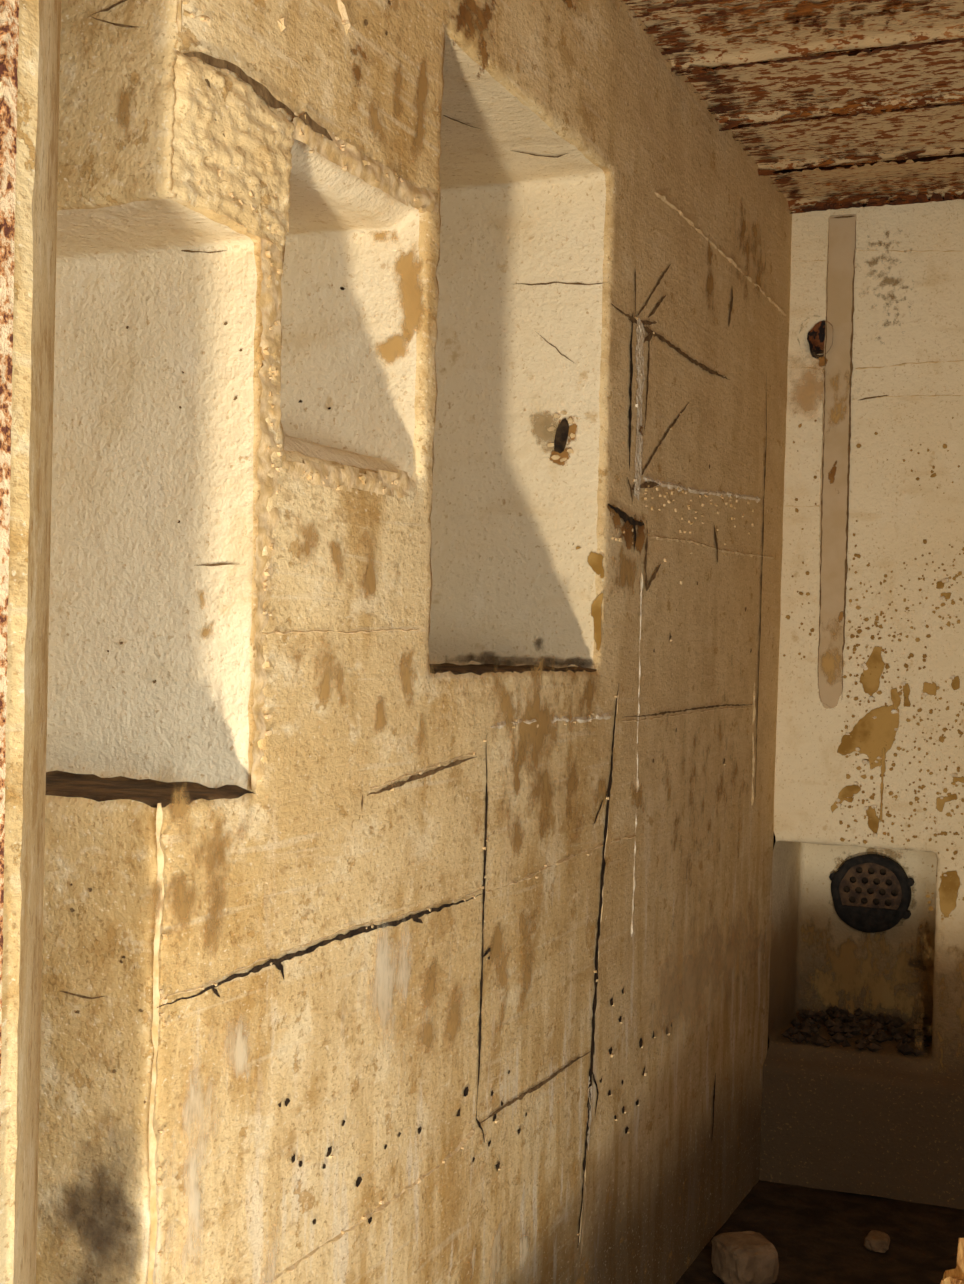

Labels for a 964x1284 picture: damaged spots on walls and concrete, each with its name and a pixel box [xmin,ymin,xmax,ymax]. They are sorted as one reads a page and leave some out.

peeling [377,251,423,363]
spalling [251,237,410,790]
spalling [531,411,577,466]
peeling [936,578,951,600]
crack [157,375,767,1245]
peeling [831,646,964,873]